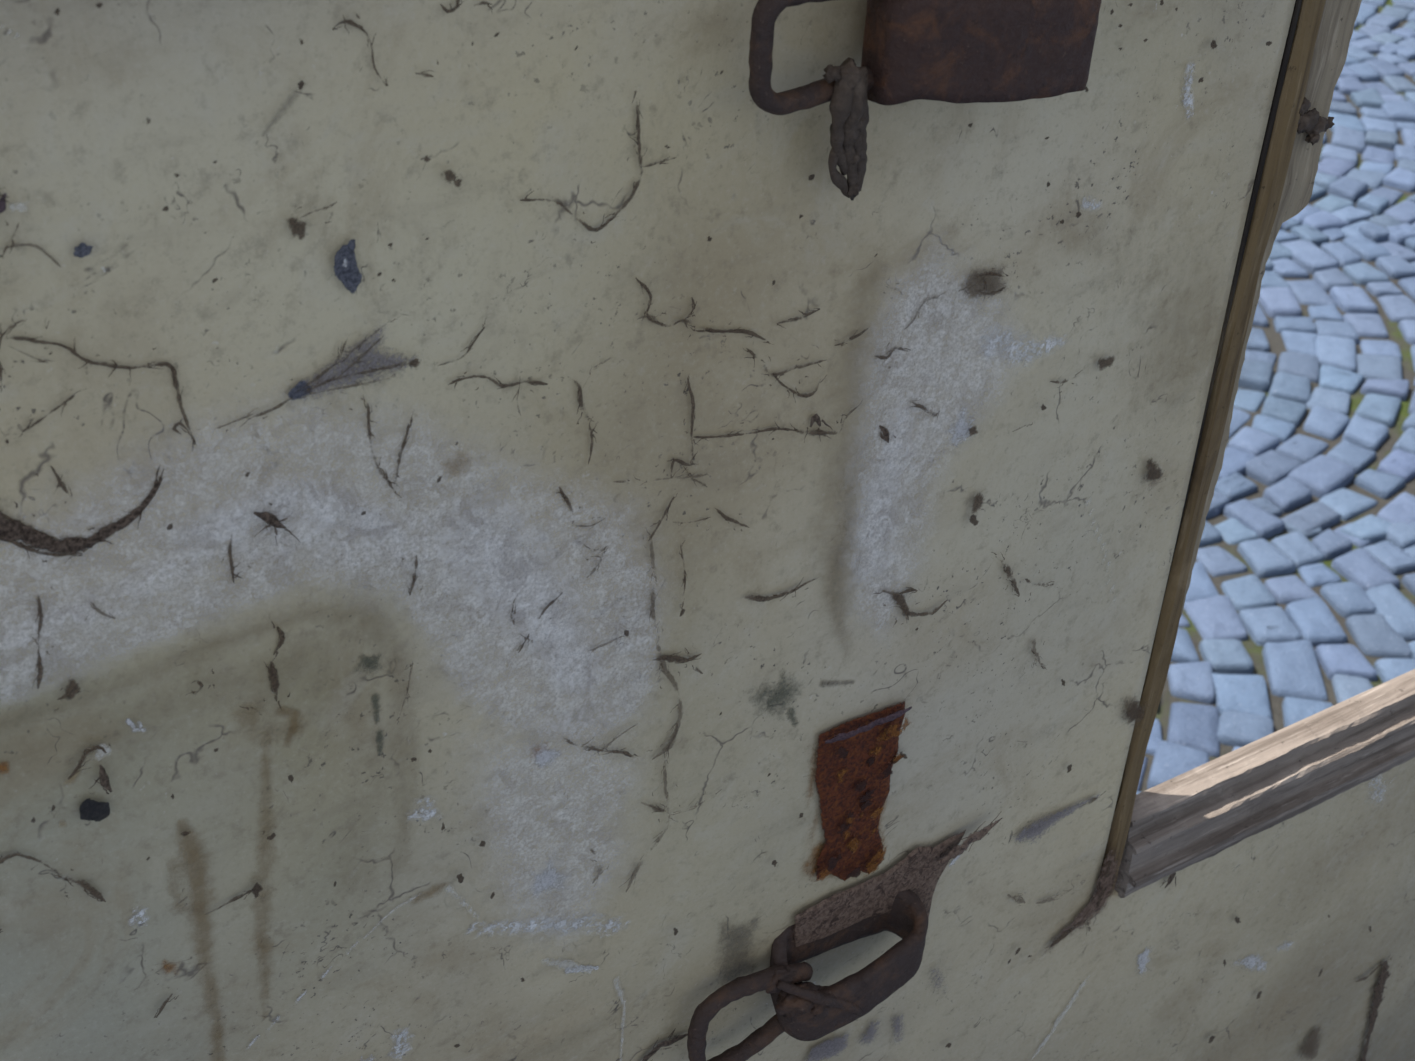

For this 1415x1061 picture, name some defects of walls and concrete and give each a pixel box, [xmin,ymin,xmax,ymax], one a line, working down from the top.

crack [520,91,676,243]
crack [0,222,61,267]
crack [351,396,413,495]
crack [0,320,255,689]
crack [402,555,423,595]
crack [438,278,969,892]
leakage [373,695,382,753]
corrosion [806,701,912,881]
crack [0,852,106,902]